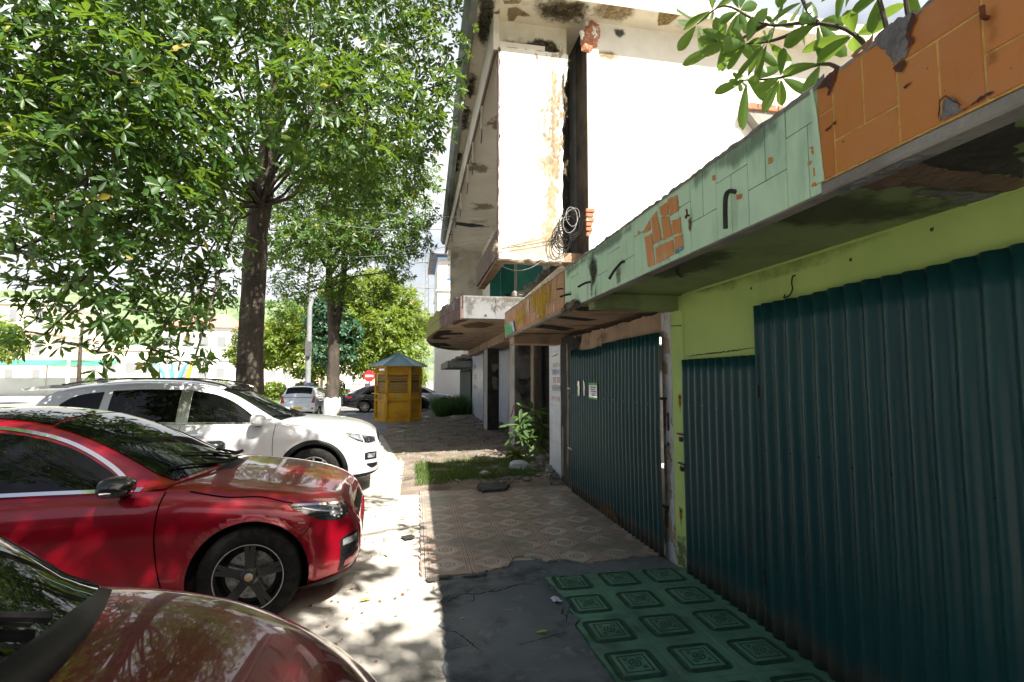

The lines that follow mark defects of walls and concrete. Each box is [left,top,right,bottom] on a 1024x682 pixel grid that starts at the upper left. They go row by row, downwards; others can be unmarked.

water stain [478,0,494,45]
water stain [537,0,633,37]
spalling [579,21,600,54]
spalling [851,9,916,72]
spalling [938,91,993,122]
peeling [638,195,684,267]
water stain [778,196,927,226]
water stain [432,297,523,349]